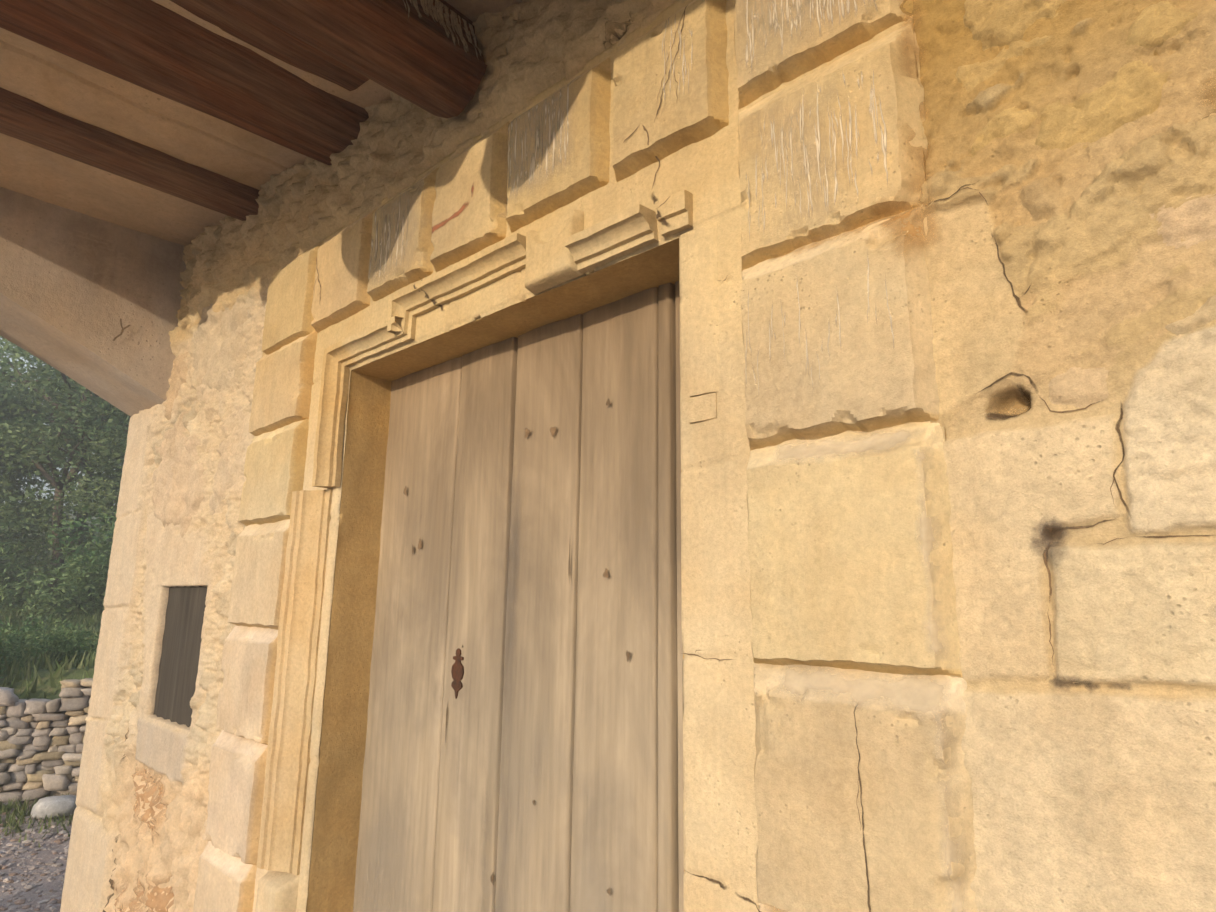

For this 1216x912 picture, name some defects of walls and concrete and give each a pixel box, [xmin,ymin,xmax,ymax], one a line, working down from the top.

crack [624,5,688,226]
rust [432,186,474,233]
crack [930,184,987,204]
crack [992,235,1030,311]
water stain [1033,522,1065,555]
crack [981,372,1211,661]
spalling [133,774,162,831]
crack [854,700,871,912]
crack [103,839,117,912]
spalling [114,883,174,912]
crack [690,873,760,912]